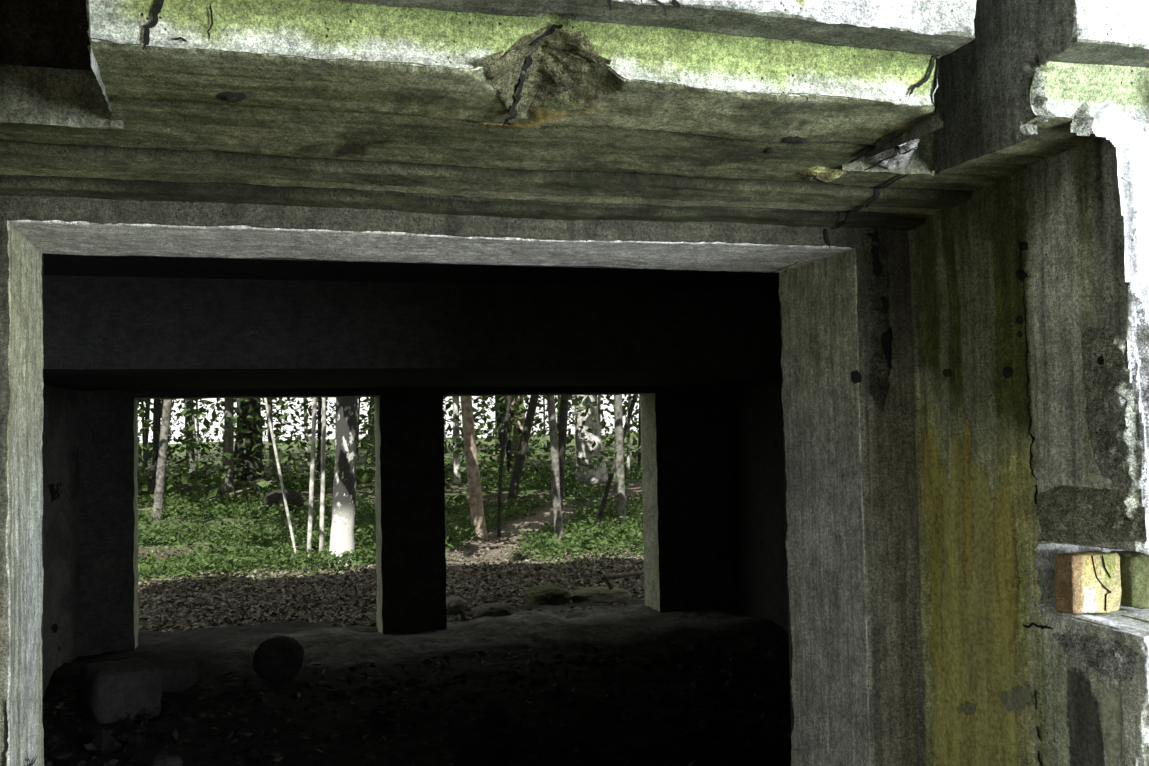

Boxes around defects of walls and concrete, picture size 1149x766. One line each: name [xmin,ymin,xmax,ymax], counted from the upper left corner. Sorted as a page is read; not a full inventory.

crack [143,0,213,50]
crack [641,0,681,15]
spalling [477,24,611,126]
crack [908,55,939,99]
spalling [1070,101,1094,136]
crack [851,132,896,163]
spalling [864,139,920,171]
spalling [798,166,847,185]
spalling [1036,327,1147,546]